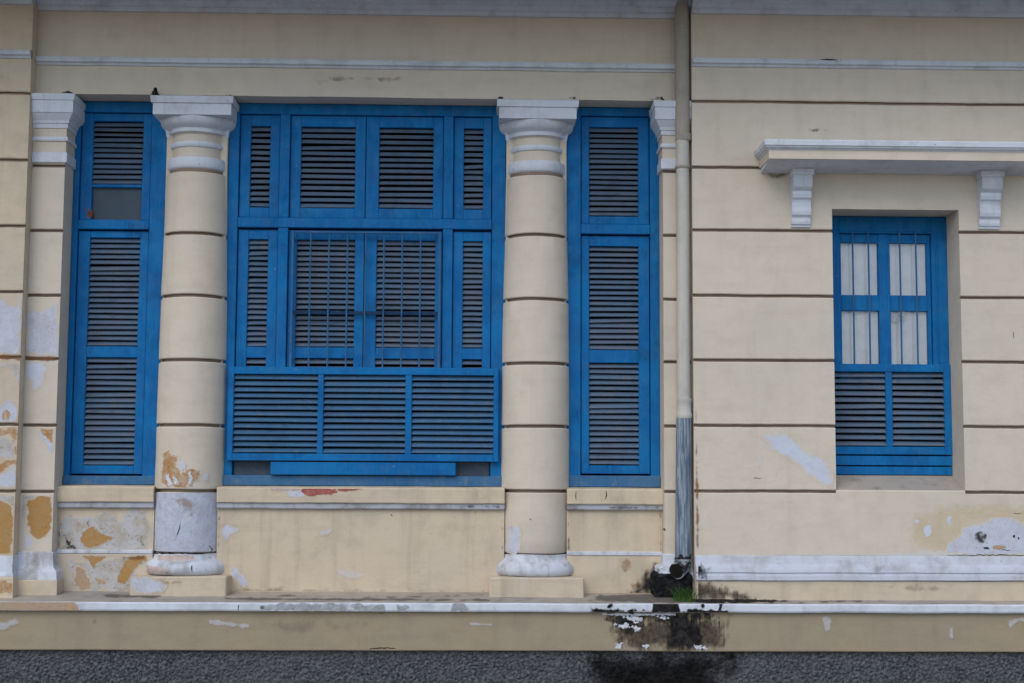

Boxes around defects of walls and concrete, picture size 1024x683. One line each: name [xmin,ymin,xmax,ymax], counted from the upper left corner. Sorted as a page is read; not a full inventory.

peeling [0,398,239,610]
flaking render [266,488,361,498]
peeling [777,516,1024,556]